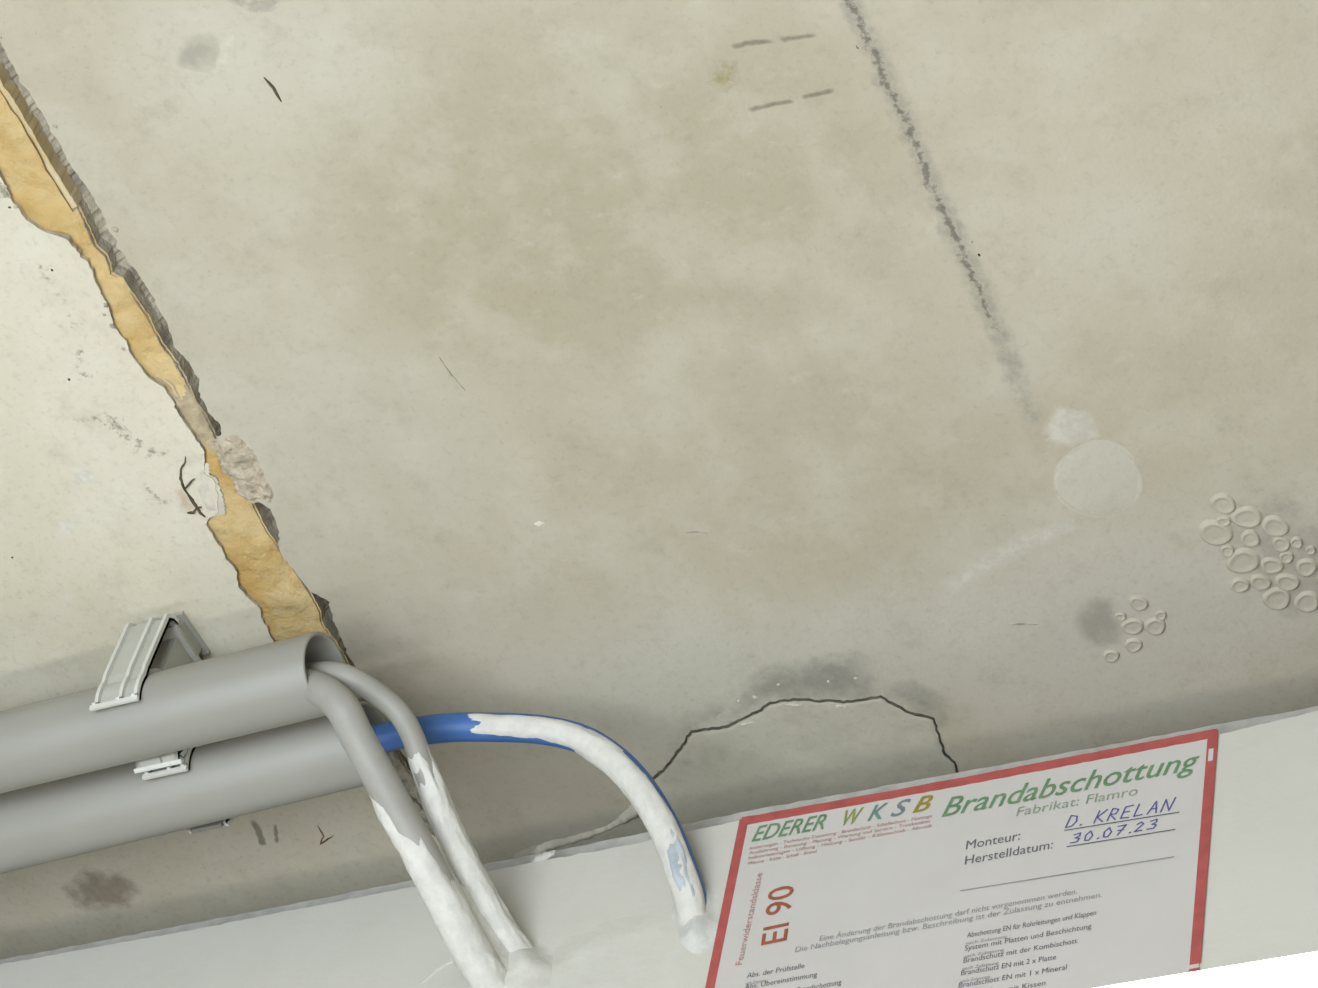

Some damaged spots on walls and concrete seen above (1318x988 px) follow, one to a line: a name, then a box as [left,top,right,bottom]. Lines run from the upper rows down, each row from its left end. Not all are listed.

spalling [226,0,293,13]
crack [0,37,369,703]
crack [392,749,435,836]